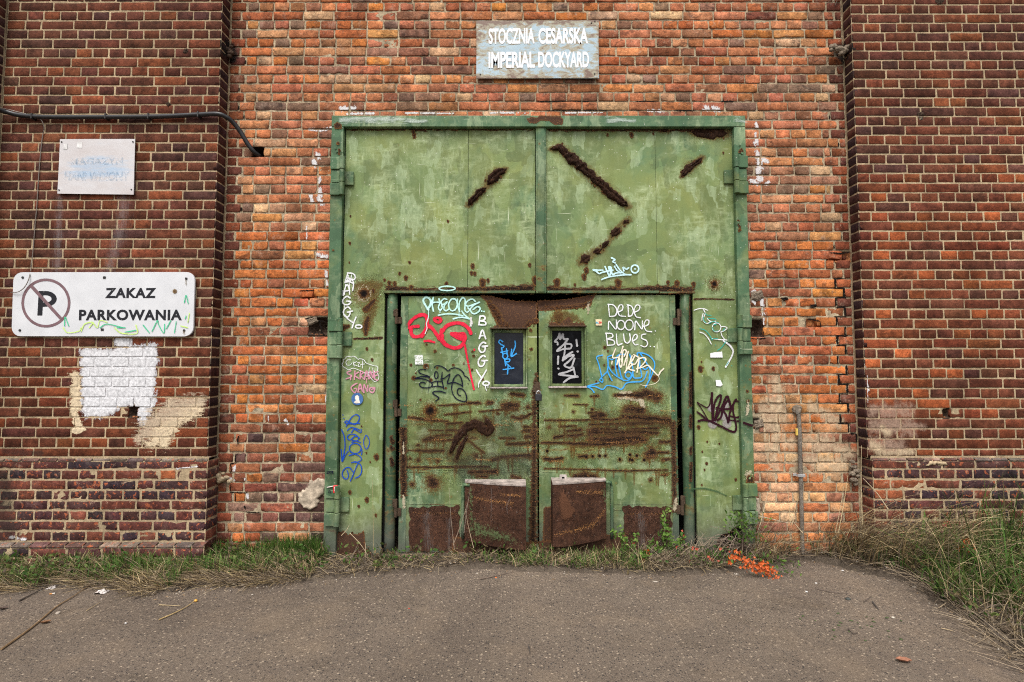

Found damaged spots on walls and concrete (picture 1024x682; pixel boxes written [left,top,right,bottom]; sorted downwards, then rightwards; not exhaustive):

spalling [307,317,328,336]
corrosion [334,115,735,362]
corrosion [365,346,720,554]